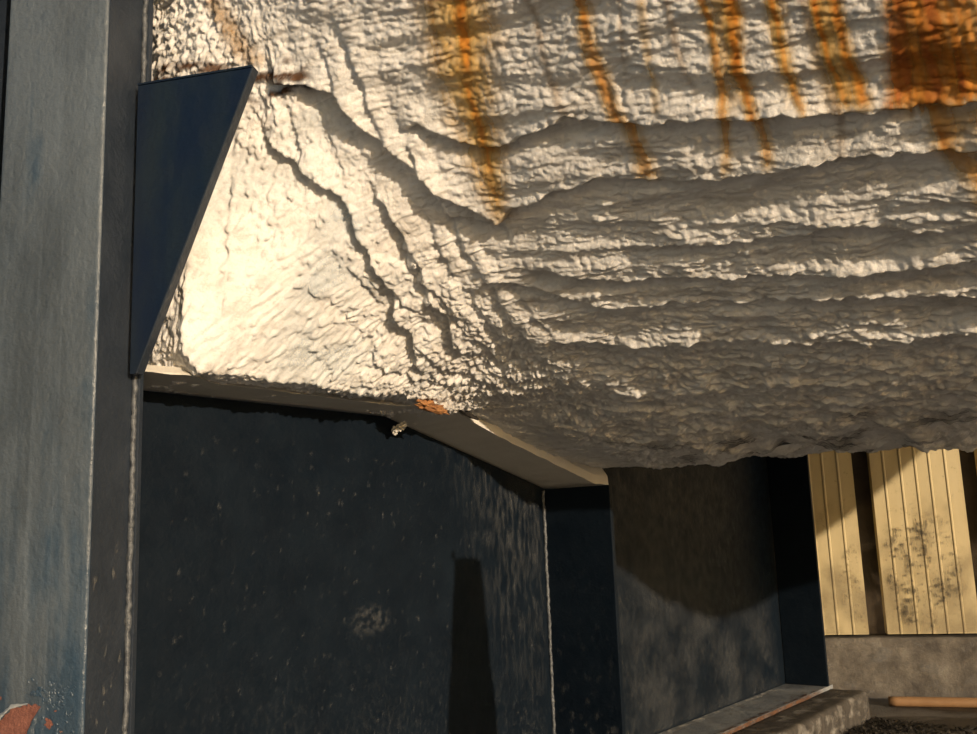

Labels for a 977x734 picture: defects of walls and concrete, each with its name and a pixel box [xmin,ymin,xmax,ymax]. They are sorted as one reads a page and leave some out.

corrosion [426,0,501,201]
corrosion [575,0,650,176]
corrosion [698,0,770,164]
corrosion [765,0,804,114]
corrosion [810,0,870,108]
corrosion [887,0,977,187]
mould [886,519,961,622]
peeling [0,696,62,734]